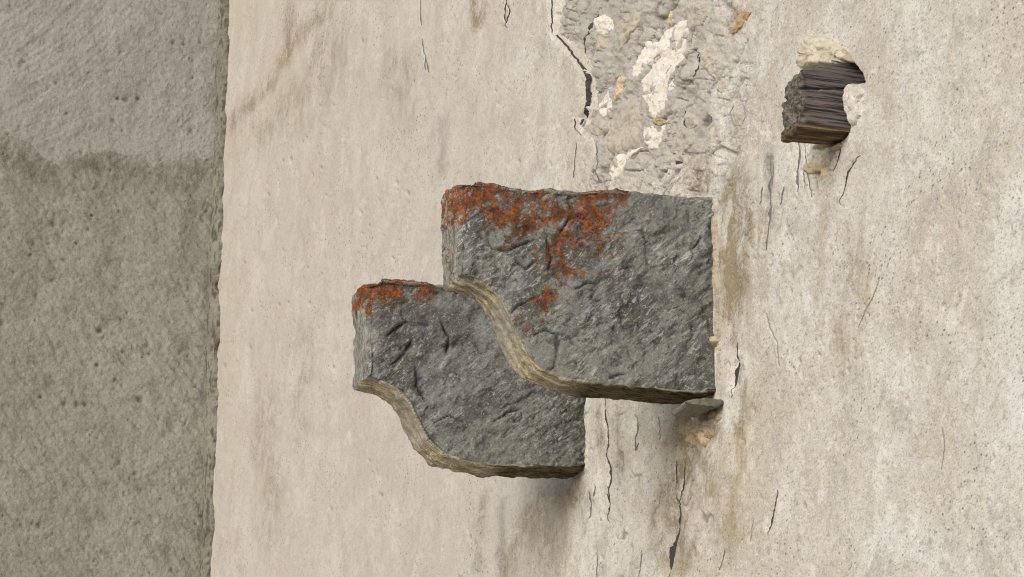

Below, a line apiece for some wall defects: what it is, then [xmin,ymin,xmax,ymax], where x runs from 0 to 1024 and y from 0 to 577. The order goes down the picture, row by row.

crack [420,0,429,72]
crack [503,0,511,28]
spalling [796,35,855,69]
crack [550,0,600,182]
spalling [559,0,775,215]
spalling [843,83,865,126]
spalling [803,142,843,179]
crack [833,149,860,204]
crack [731,344,741,398]
crack [588,400,612,522]
crack [668,461,686,577]
crack [750,489,778,541]